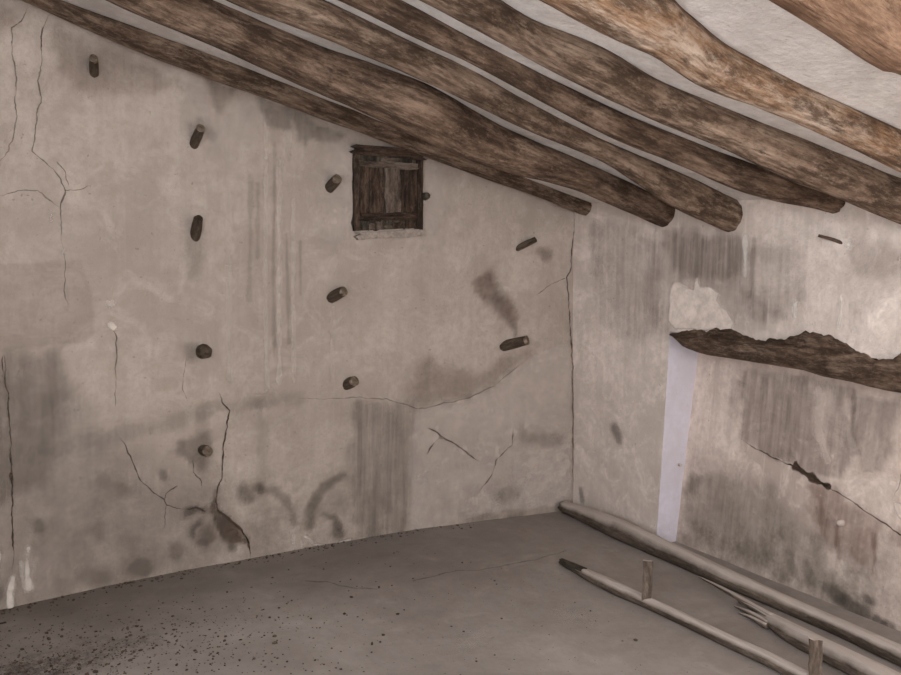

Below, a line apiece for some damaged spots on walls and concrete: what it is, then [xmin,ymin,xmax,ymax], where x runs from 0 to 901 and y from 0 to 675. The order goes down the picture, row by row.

crack [7,22,87,217]
flaking render [669,279,733,330]
crack [2,356,14,562]
crack [124,396,251,559]
crack [747,443,901,536]